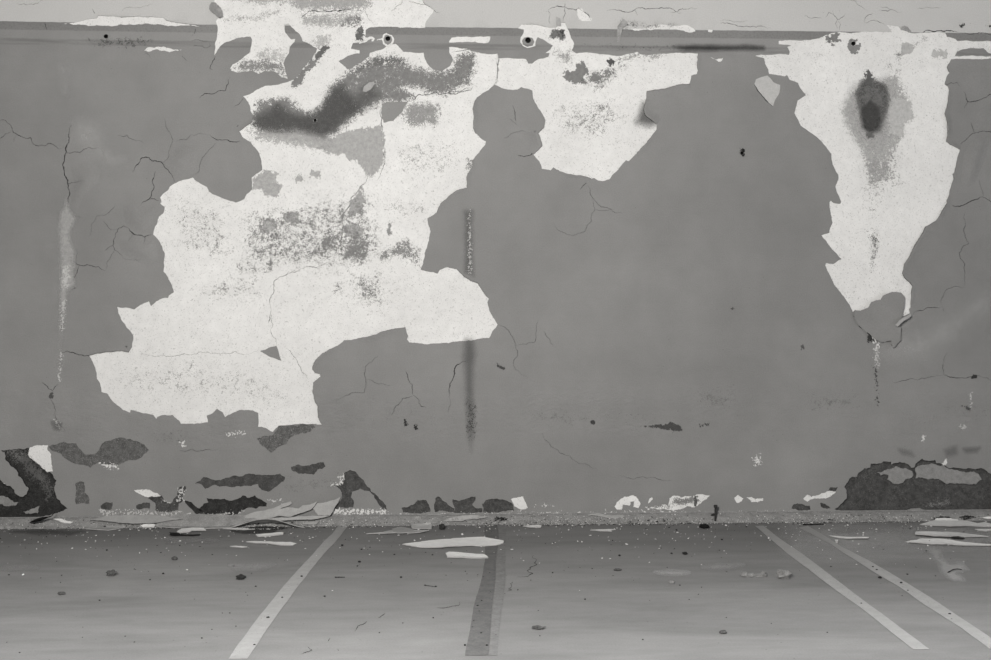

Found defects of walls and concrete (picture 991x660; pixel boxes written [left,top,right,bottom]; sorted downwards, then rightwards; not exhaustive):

peeling [65,11,201,26]
crack [301,8,369,19]
damp [853,69,891,140]
damp [58,201,75,331]
crack [1,121,239,290]
peeling [88,0,723,452]
peeling [755,25,991,347]
flaking render [0,437,148,524]
flaking render [134,462,325,515]
flaking render [792,459,991,546]